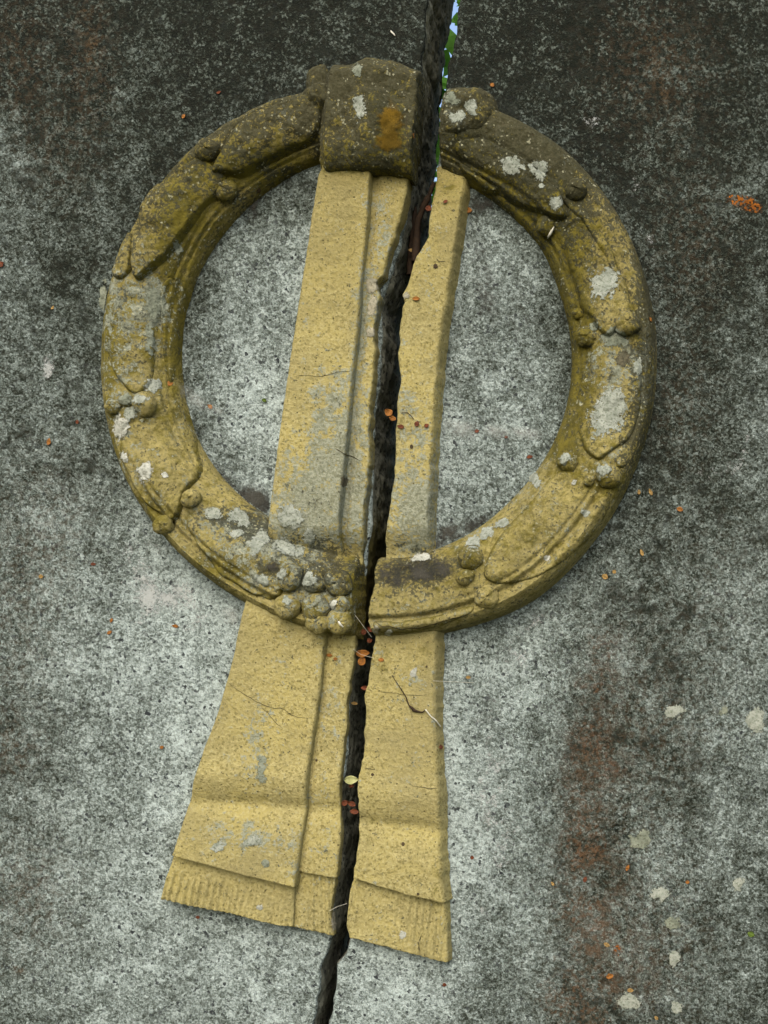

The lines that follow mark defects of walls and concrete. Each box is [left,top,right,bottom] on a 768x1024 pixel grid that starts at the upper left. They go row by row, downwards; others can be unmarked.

crack [314,0,468,1024]
rust [540,624,660,1024]